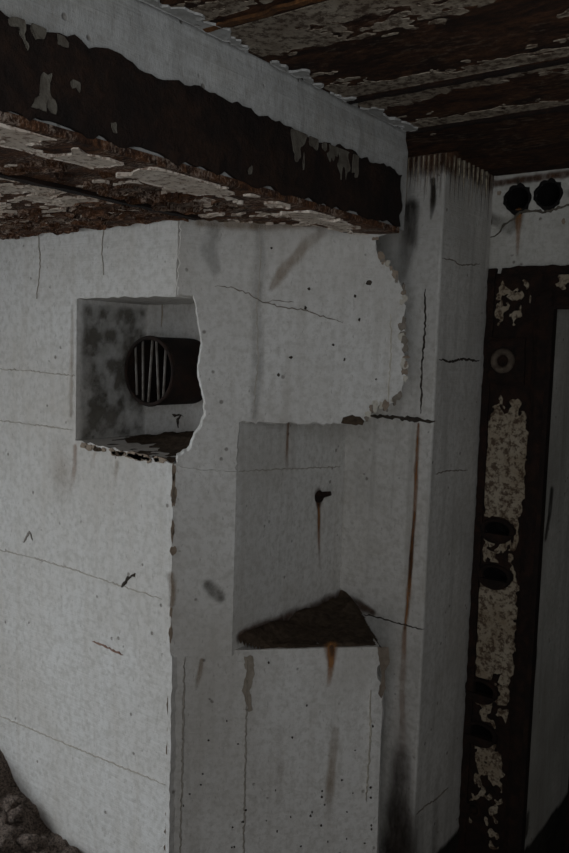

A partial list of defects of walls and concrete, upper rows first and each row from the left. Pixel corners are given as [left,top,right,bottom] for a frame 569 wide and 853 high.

peeling [139,0,569,135]
peeling [0,123,379,241]
crack [490,204,569,238]
leakage [82,307,145,439]
crack [215,226,343,416]
spalling [341,391,402,425]
crack [370,289,480,423]
peeling [494,279,531,326]
corrosion [404,423,419,641]
peeling [475,395,529,729]
corrosion [327,643,336,675]
peeling [469,744,505,850]